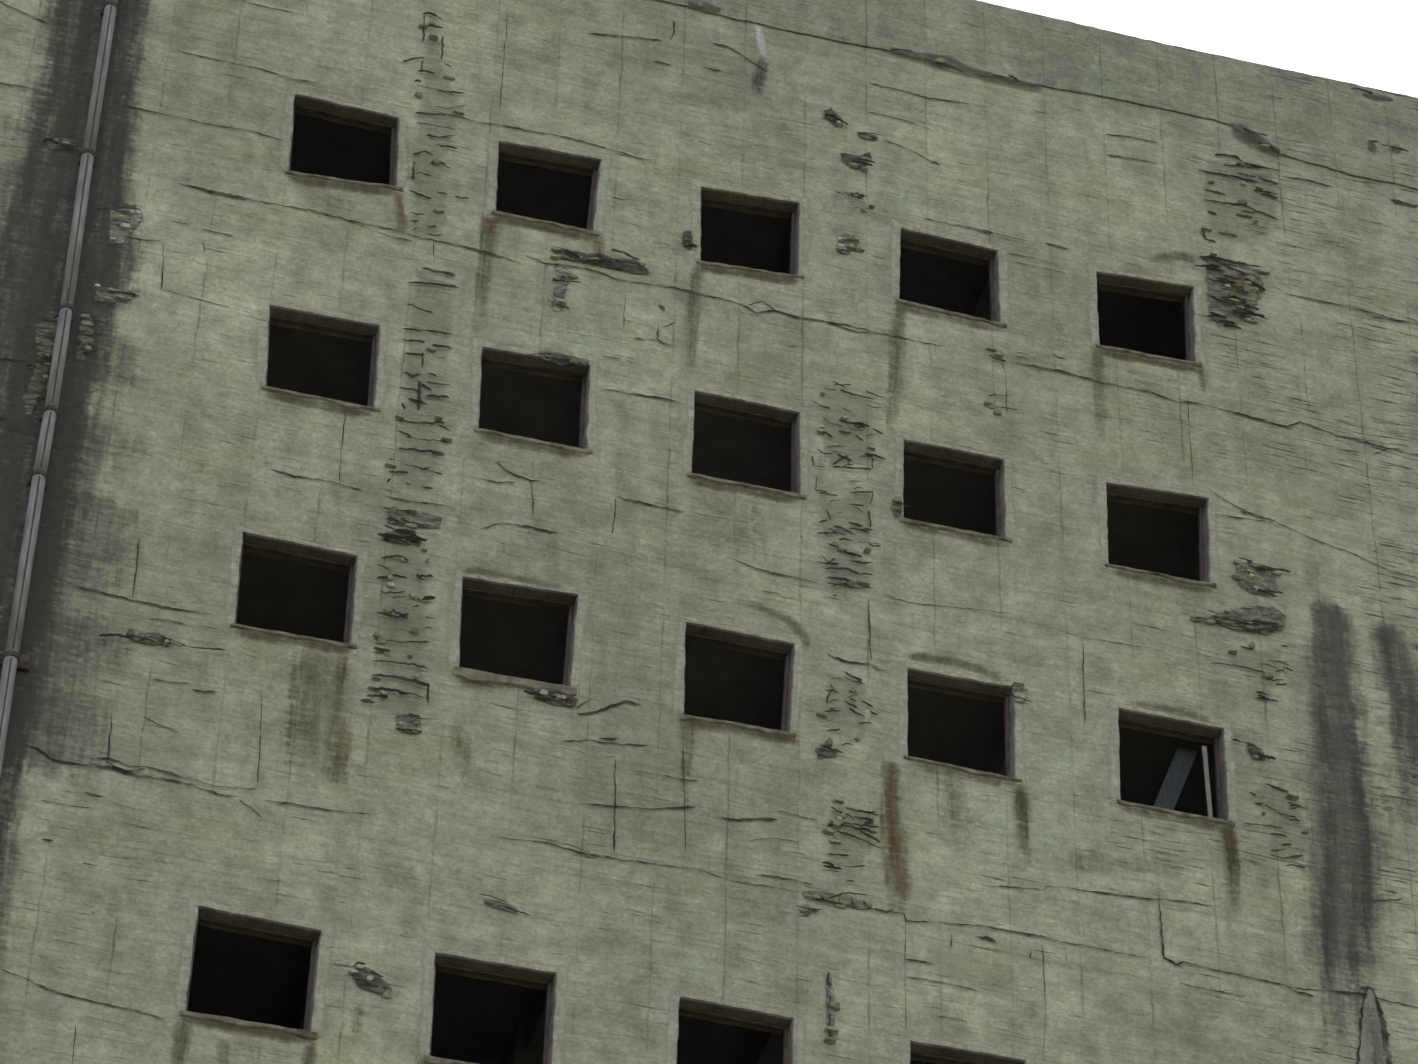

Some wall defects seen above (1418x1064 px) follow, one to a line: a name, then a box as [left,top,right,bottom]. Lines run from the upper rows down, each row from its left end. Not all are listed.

crack [586,20,767,72]
spalling [1194,122,1332,330]
leakage [0,0,148,916]
spalling [384,304,452,489]
spalling [811,375,885,596]
crack [153,679,215,693]
crack [20,697,368,818]
spalling [360,506,442,734]
spalling [798,797,882,916]
spalling [1190,557,1293,702]
leakage [1308,604,1380,983]
leakage [1375,626,1418,788]